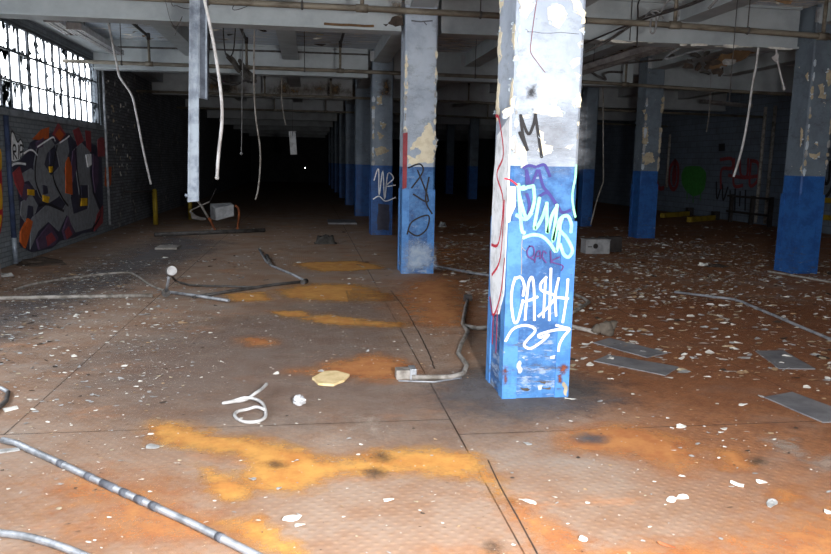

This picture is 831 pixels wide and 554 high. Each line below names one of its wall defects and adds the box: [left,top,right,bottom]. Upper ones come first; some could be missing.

spalling [384,16,404,27]
peeling [371,96,389,165]
peeling [407,50,438,165]
peeling [493,0,586,168]
peeling [641,98,663,171]
peeling [800,59,831,176]
rust [225,292,271,302]
rust [271,248,478,328]
rust [148,423,502,500]
rust [560,423,700,473]
rust [232,517,303,554]